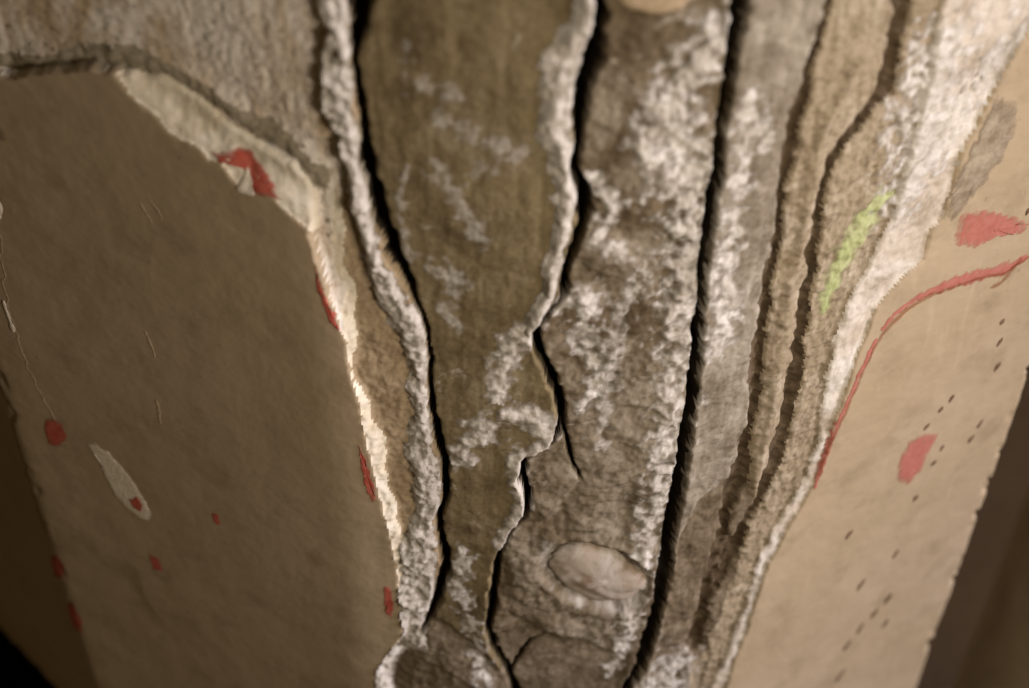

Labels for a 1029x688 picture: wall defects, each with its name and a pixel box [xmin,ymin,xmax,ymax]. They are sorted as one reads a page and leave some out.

flaking render [0,0,417,616]
crack [347,0,451,625]
crack [485,457,548,688]
crack [532,0,607,475]
crack [622,0,747,688]
spalling [344,0,1029,688]
crack [684,0,912,652]